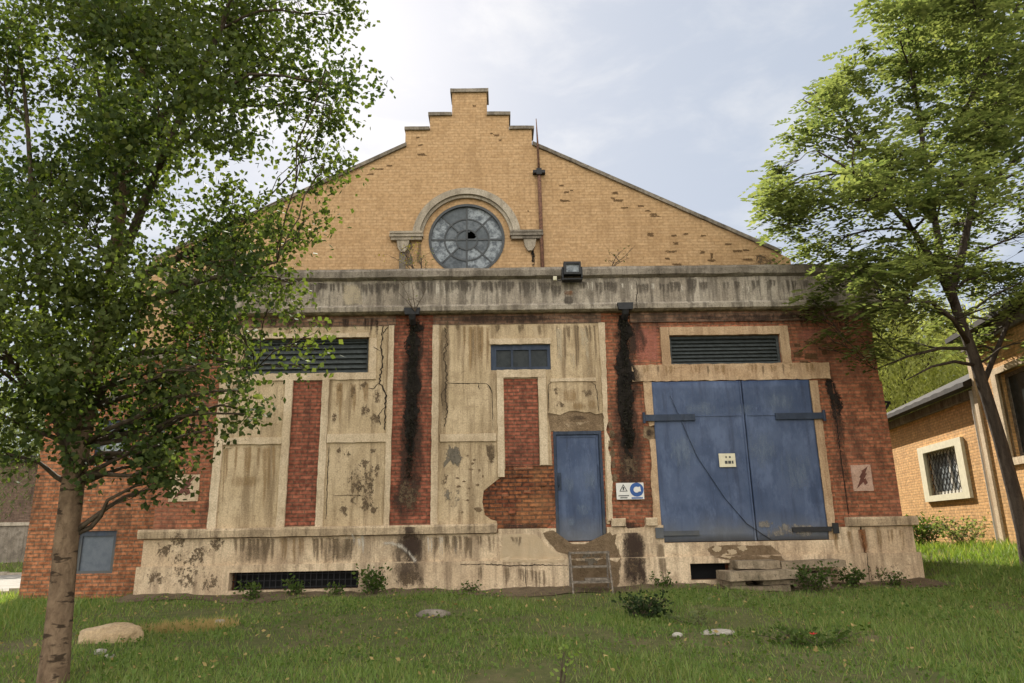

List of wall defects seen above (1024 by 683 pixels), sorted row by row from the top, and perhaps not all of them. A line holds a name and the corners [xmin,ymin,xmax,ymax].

damp [416,281,561,296]
damp [579,279,707,292]
crack [370,326,388,430]
crack [441,329,493,427]
damp [337,449,380,517]
damp [147,533,364,591]
damp [385,527,490,586]
flaking render [456,455,621,588]
damp [624,522,646,584]
flaking render [707,521,812,561]